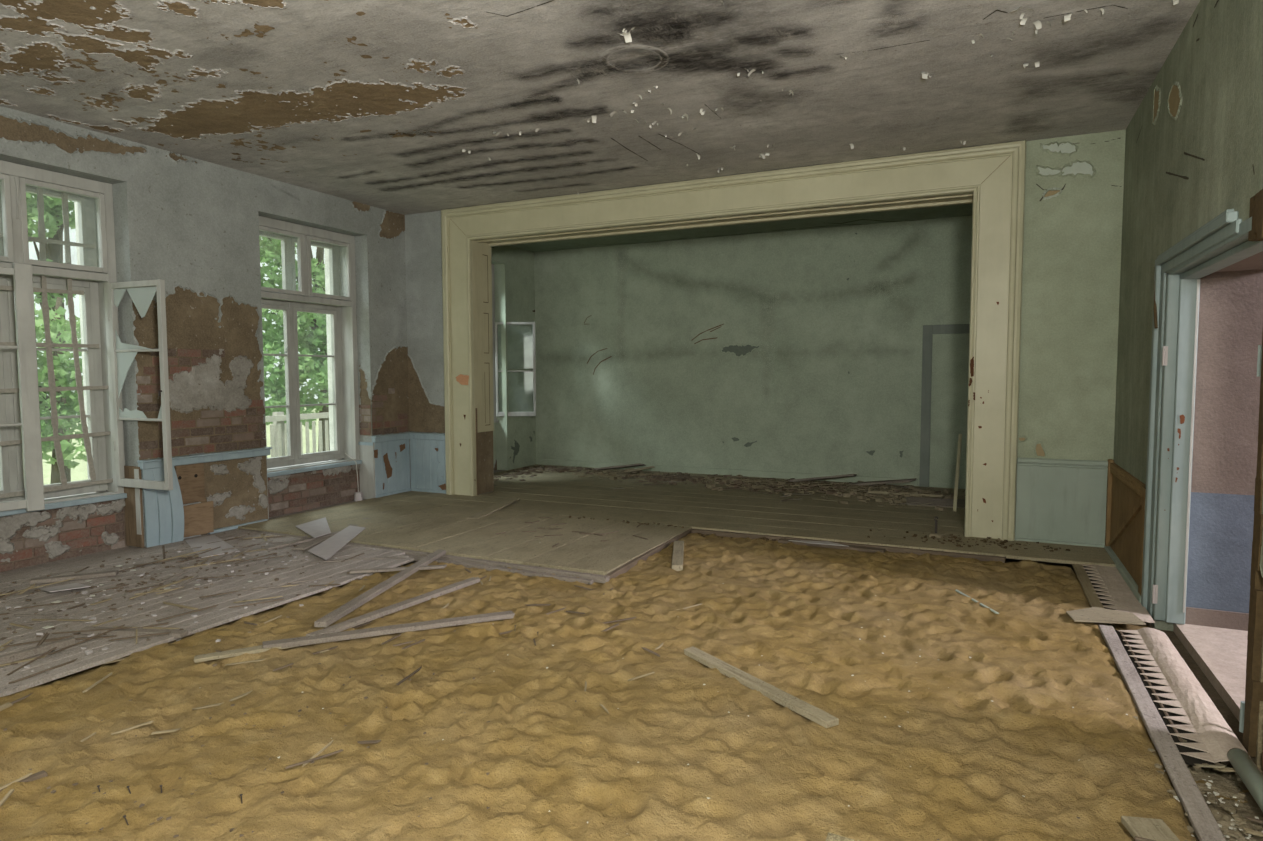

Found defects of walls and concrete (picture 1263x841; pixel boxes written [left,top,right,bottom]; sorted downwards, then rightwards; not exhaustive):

peeling [0,0,468,176]
peeling [350,201,405,241]
peeling [445,13,478,29]
damp [370,2,815,191]
peeling [1036,140,1096,179]
peeling [132,284,291,536]
peeling [358,345,446,491]